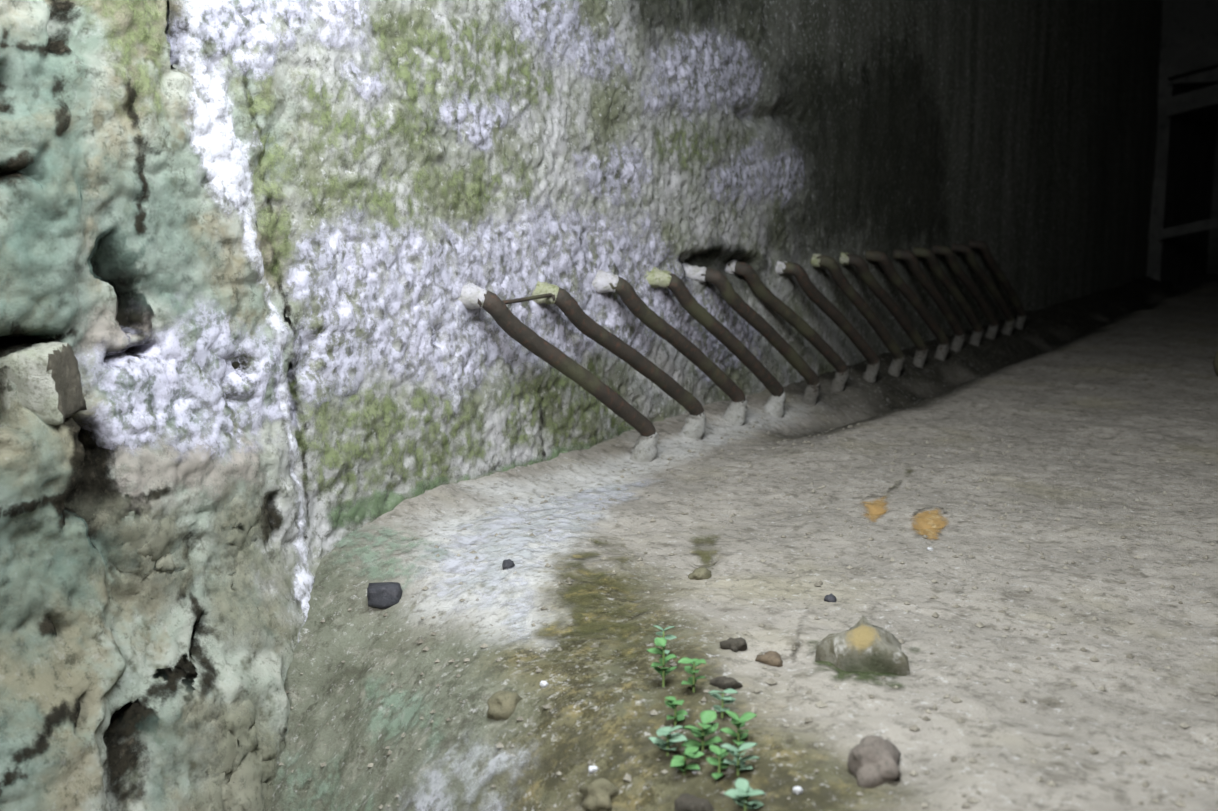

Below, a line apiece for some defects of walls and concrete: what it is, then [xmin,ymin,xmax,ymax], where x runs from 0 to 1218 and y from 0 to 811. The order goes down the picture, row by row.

crack [108,487,169,512]
crack [107,532,227,735]